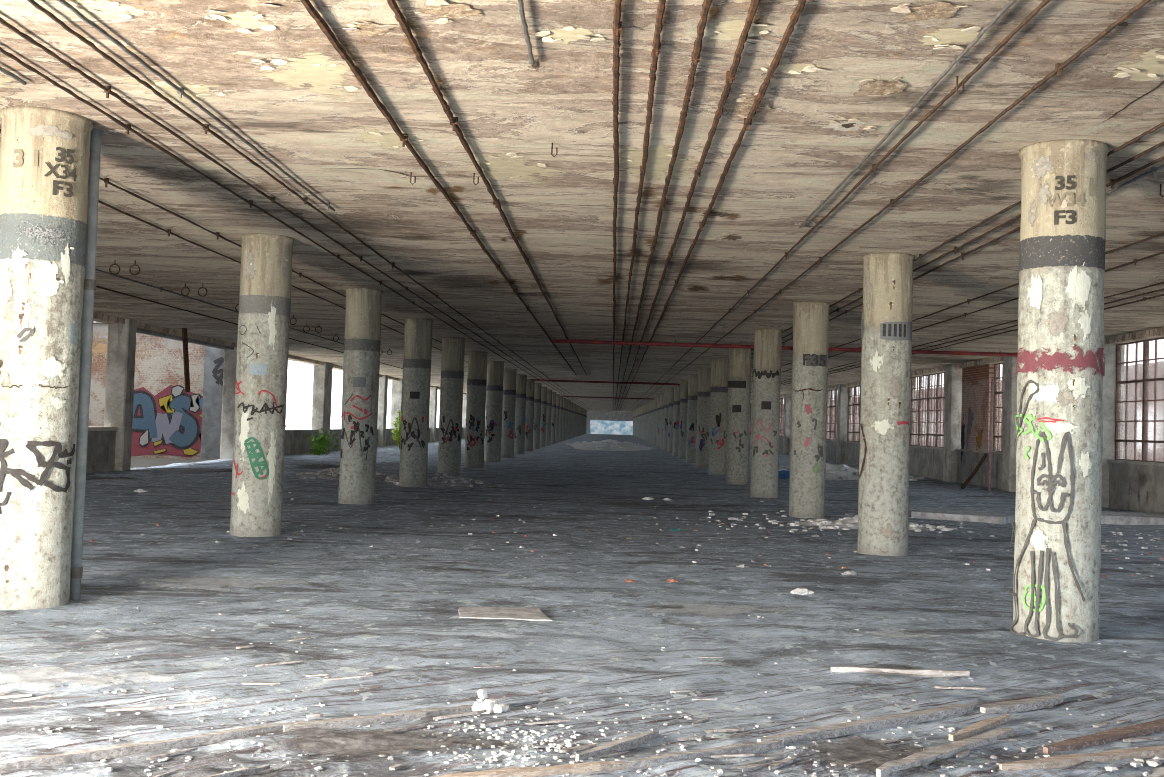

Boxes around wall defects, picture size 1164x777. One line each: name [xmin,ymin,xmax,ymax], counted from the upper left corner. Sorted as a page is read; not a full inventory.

peeling [890,0,990,50]
peeling [252,51,358,102]
peeling [1113,49,1164,81]
peeling [9,242,74,296]
peeling [19,299,34,329]
peeling [15,356,67,409]